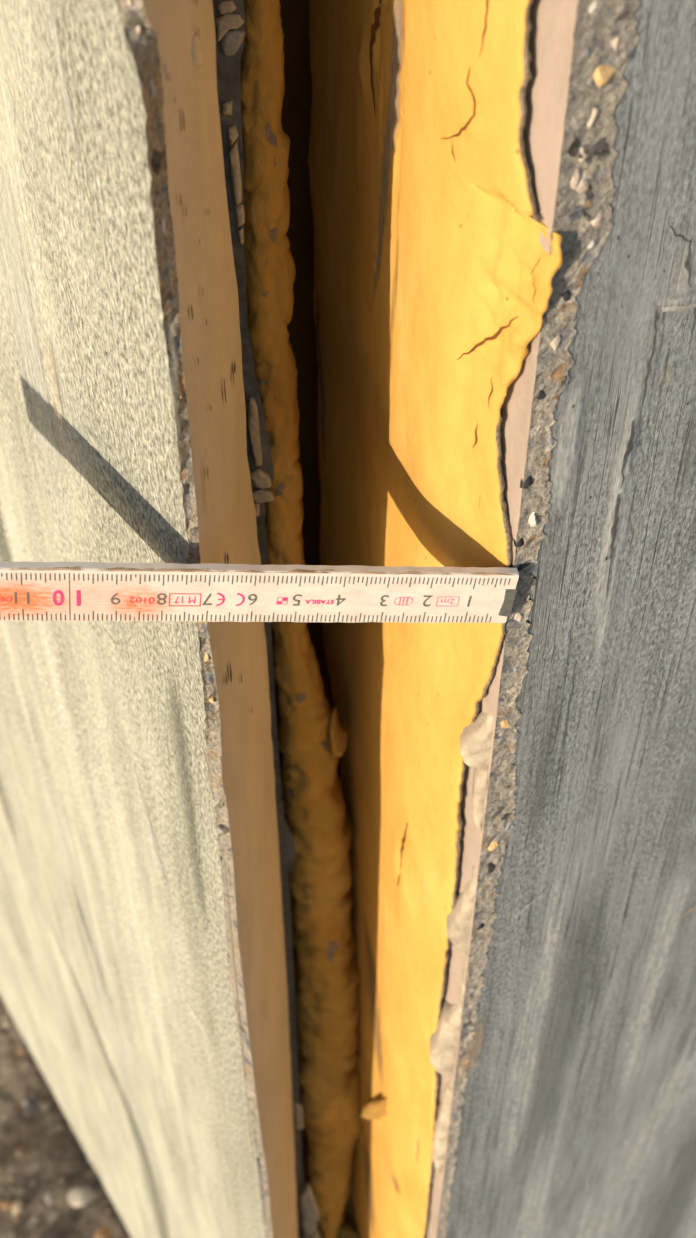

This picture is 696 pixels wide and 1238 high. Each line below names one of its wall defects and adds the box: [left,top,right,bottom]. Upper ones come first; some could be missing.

crack [370,0,381,116]
crack [441,0,488,161]
crack [457,258,540,360]